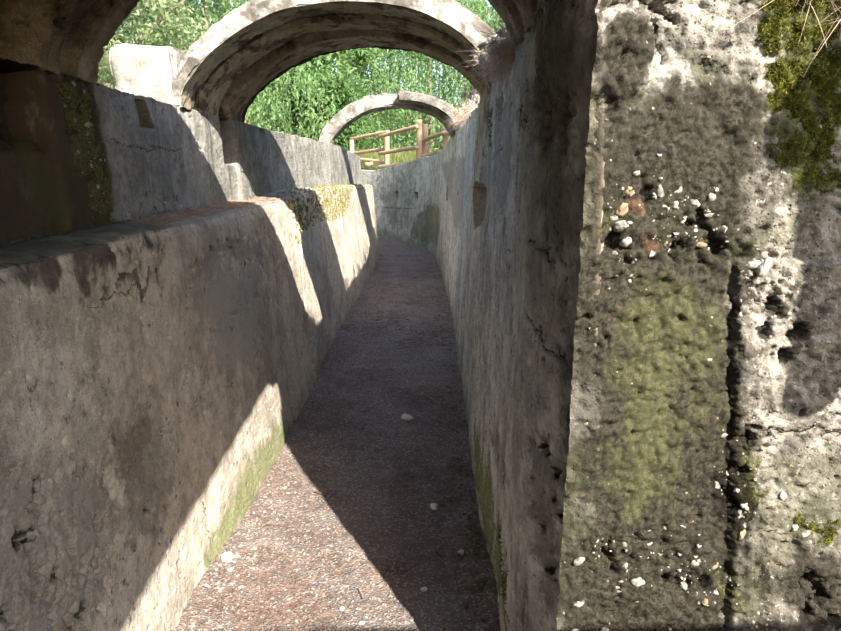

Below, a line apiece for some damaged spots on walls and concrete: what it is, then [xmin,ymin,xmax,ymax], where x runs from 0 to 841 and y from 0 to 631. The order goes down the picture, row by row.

water stain [535,0,584,256]
water stain [204,424,290,568]
water stain [474,425,507,631]
water stain [557,0,841,631]
crack [720,265,841,513]